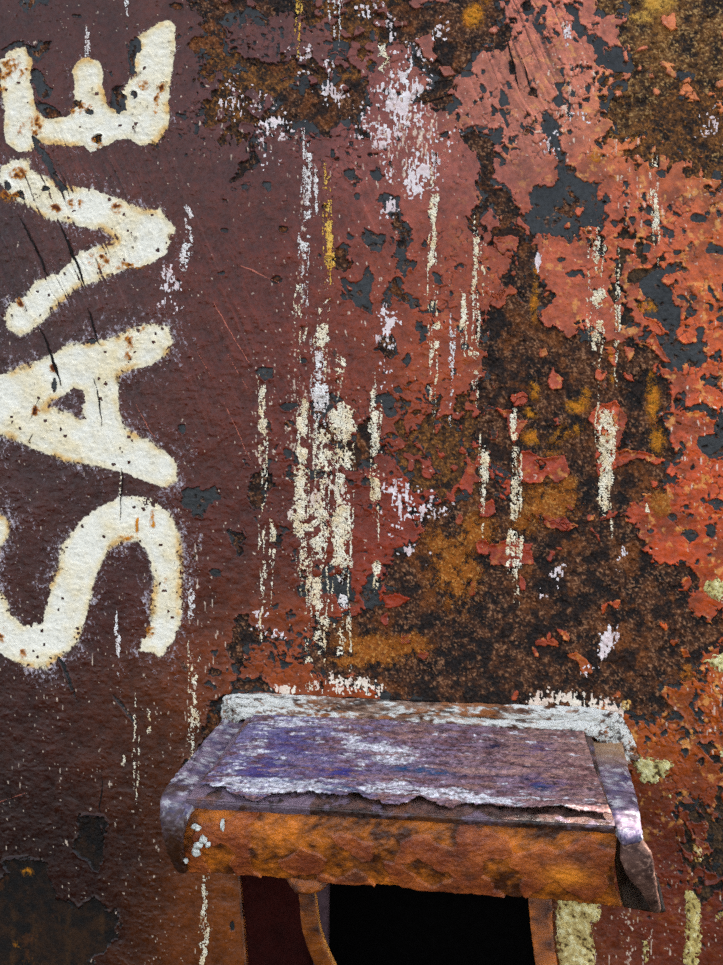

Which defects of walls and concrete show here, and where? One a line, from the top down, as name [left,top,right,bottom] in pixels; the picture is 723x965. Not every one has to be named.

rust [629,0,674,21]
peeling [169,0,546,190]
peeling [564,0,723,194]
peeling [208,82,723,722]
rust [522,431,539,444]
rust [566,388,590,414]
rust [646,372,666,452]
rust [422,476,578,608]
rust [331,631,436,668]
peeling [199,698,223,746]
peeling [675,788,723,914]
peeling [0,856,123,965]